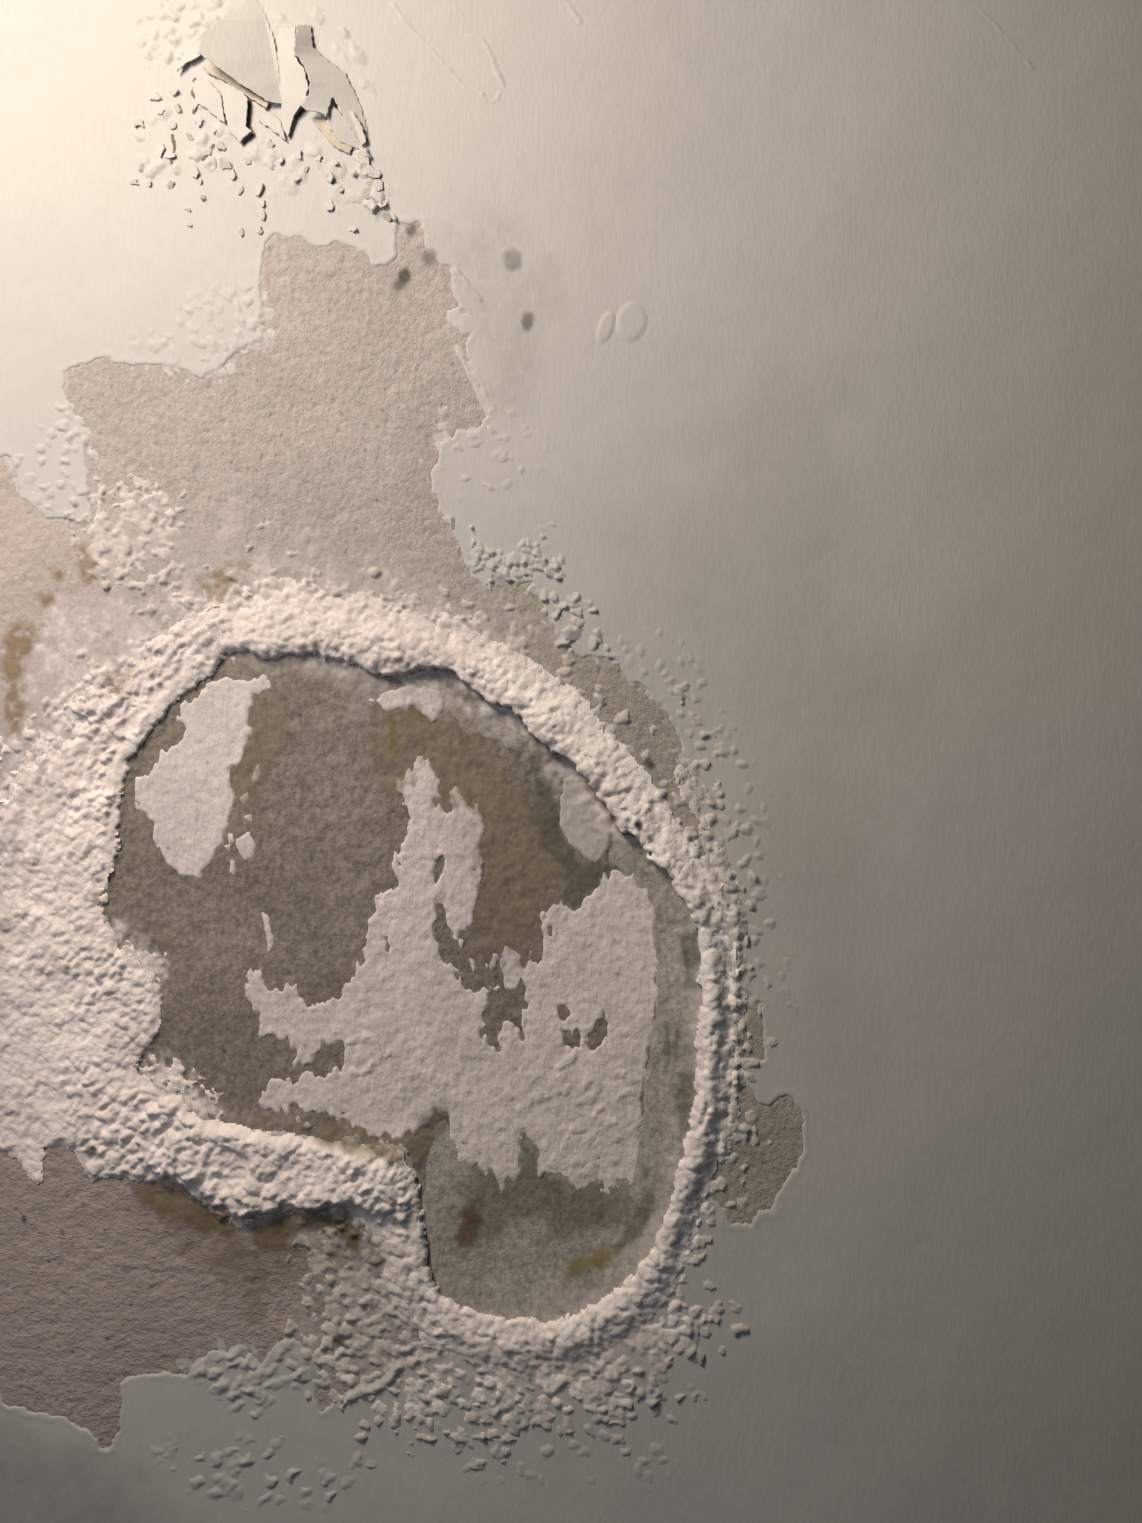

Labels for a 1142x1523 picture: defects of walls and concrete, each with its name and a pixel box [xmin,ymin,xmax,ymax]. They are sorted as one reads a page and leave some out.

flaking render [0,0,706,867]
flaking render [0,1145,435,1448]
peeling [97,650,636,1210]
leakage [0,467,778,1470]
peeling [424,1228,437,1286]
flaking render [709,990,804,1224]